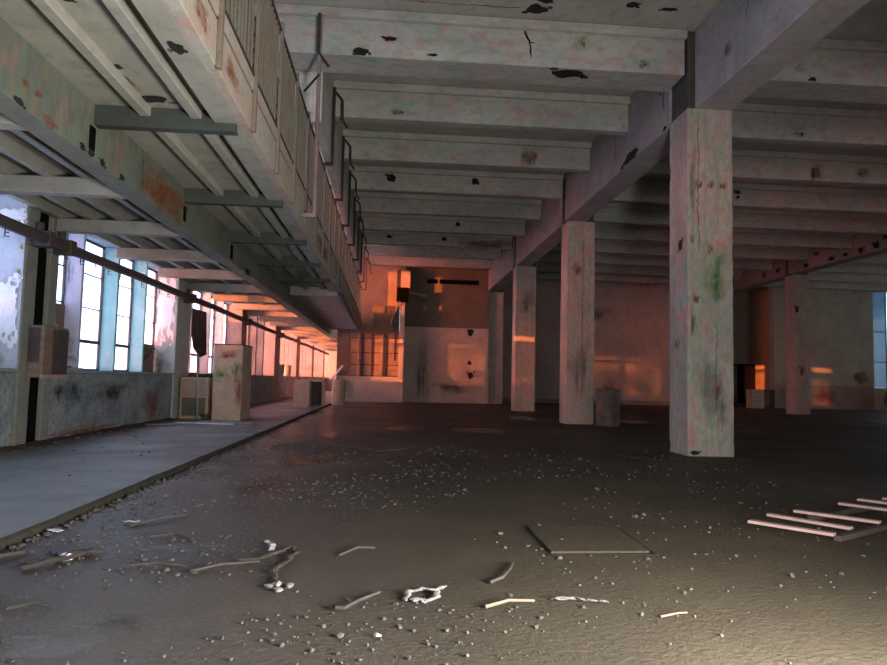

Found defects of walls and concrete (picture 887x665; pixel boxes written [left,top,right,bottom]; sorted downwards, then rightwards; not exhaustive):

spalling [522,0,554,14]
crack [524,31,534,57]
spalling [352,47,372,56]
spalling [549,67,588,79]
peeling [0,273,23,348]